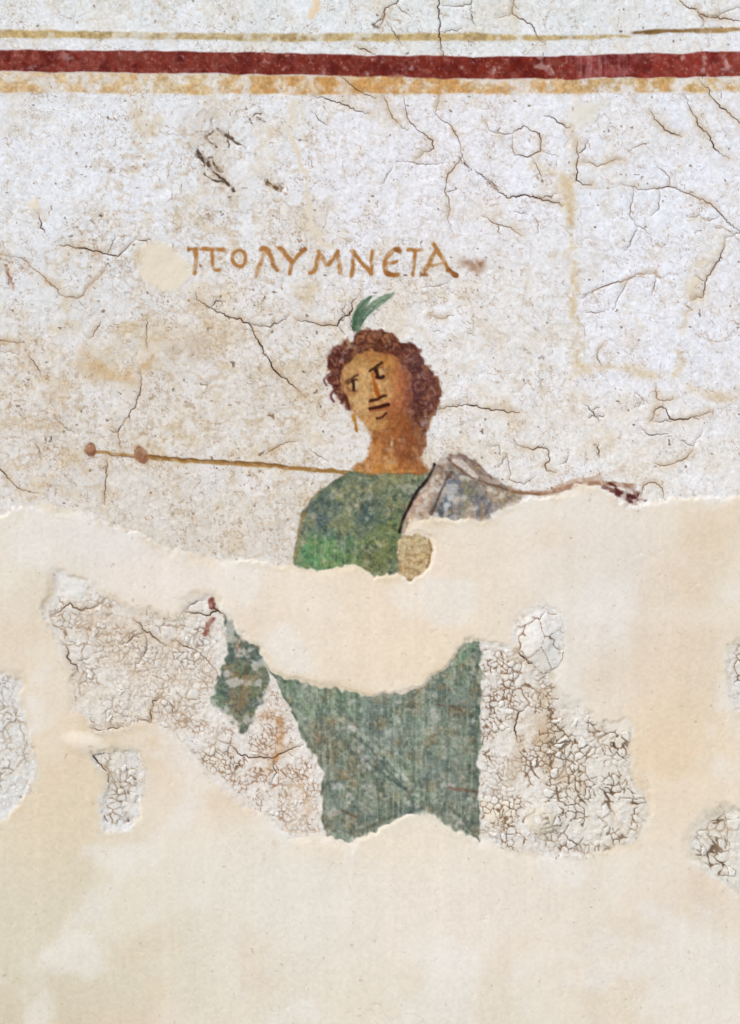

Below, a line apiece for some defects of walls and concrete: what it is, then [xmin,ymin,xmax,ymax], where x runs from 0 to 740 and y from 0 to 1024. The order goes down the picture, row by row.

crack [356,0,412,55]
crack [437,0,546,56]
crack [679,0,740,27]
crack [311,76,740,301]
crack [0,214,151,339]
crack [195,292,358,398]
crack [581,272,656,314]
crack [101,317,148,505]
spalling [605,481,648,507]
crack [44,594,323,838]
crack [476,610,649,857]
crack [690,811,740,884]